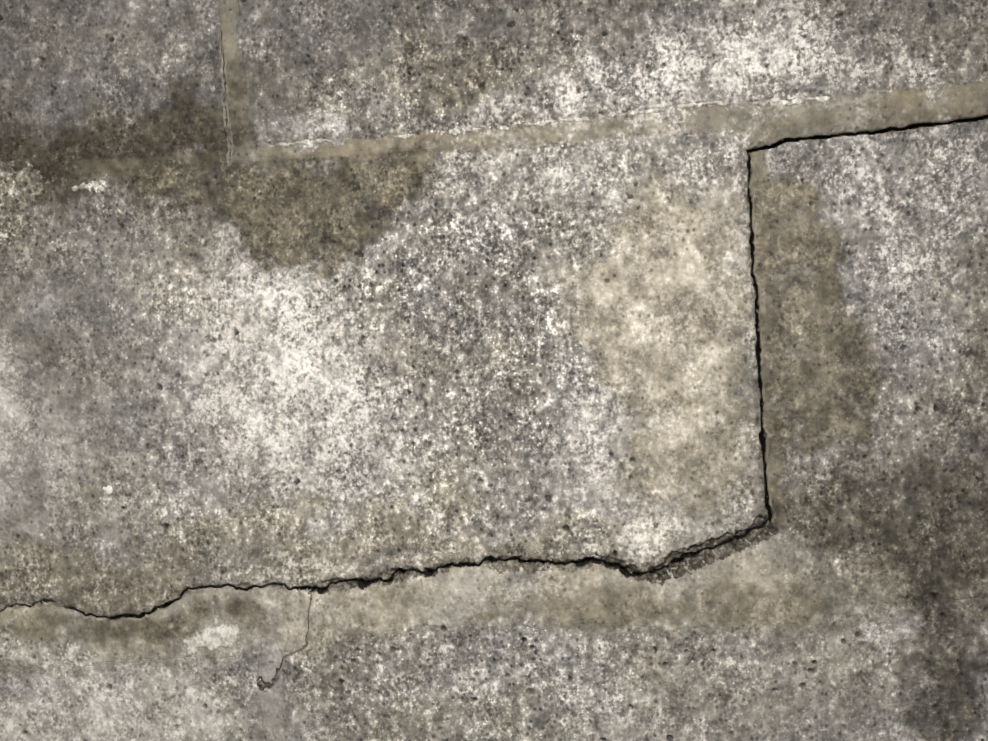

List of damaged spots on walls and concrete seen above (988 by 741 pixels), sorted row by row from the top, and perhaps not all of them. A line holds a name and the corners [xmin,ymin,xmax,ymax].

damp [0,0,988,531]
crack [1,106,988,687]
damp [771,454,988,741]